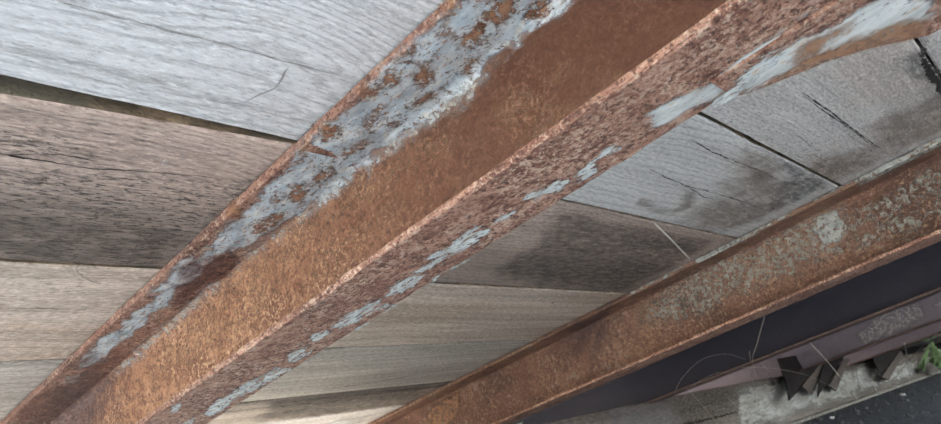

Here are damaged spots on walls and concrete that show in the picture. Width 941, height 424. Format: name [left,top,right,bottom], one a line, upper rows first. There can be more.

crack [799,90,886,153]
crack [0,153,225,180]
peeling [64,0,571,384]
peeling [523,145,621,201]
crack [647,167,763,210]
crack [693,140,776,179]
rust [176,255,237,304]
peeling [183,210,516,424]
rust [777,355,849,401]
rust [872,349,903,380]